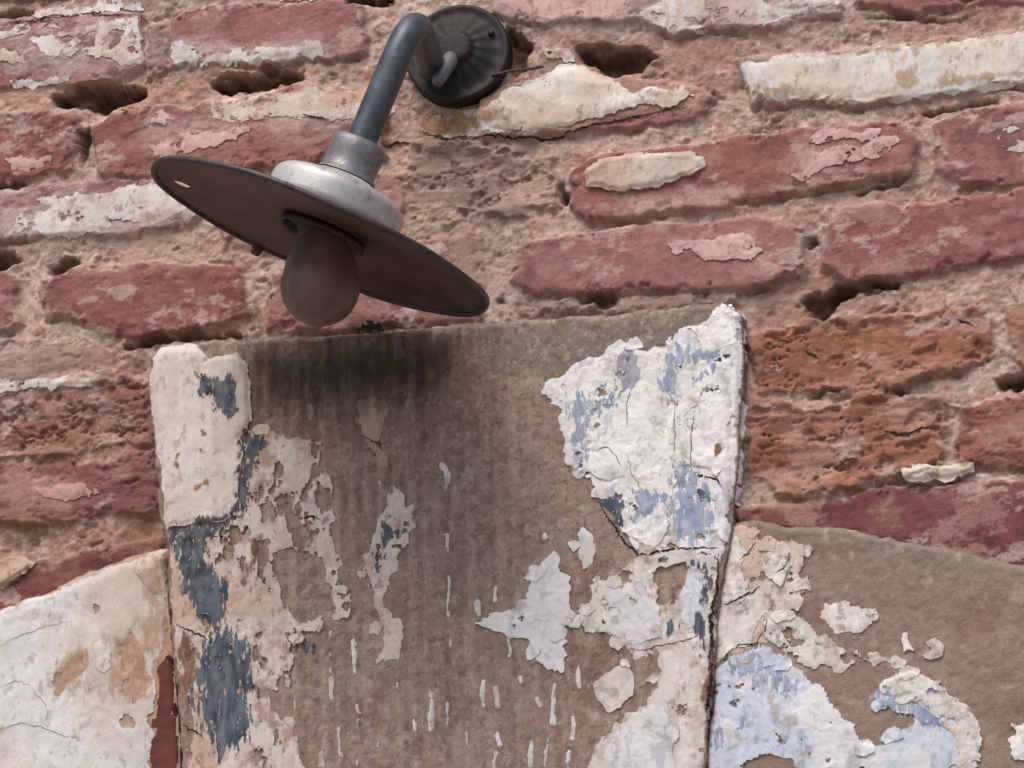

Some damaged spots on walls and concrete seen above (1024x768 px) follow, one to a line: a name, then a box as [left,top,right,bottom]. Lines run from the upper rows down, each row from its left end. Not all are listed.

peeling [739,31,1024,119]
peeling [790,128,900,182]
peeling [0,181,187,271]
peeling [356,395,389,468]
crack [591,447,639,492]
crack [671,403,723,489]
peeling [475,273,994,768]
peeling [0,424,351,768]
peeling [357,486,416,664]